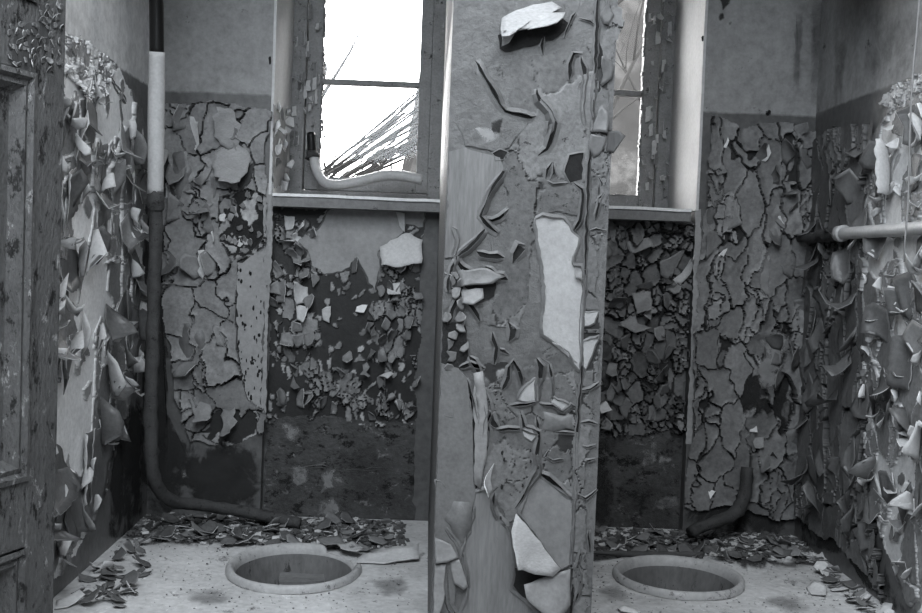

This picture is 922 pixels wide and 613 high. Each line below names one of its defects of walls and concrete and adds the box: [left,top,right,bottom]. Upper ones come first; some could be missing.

peeling [7,0,149,579]
peeling [159,71,426,552]
peeling [431,0,922,613]